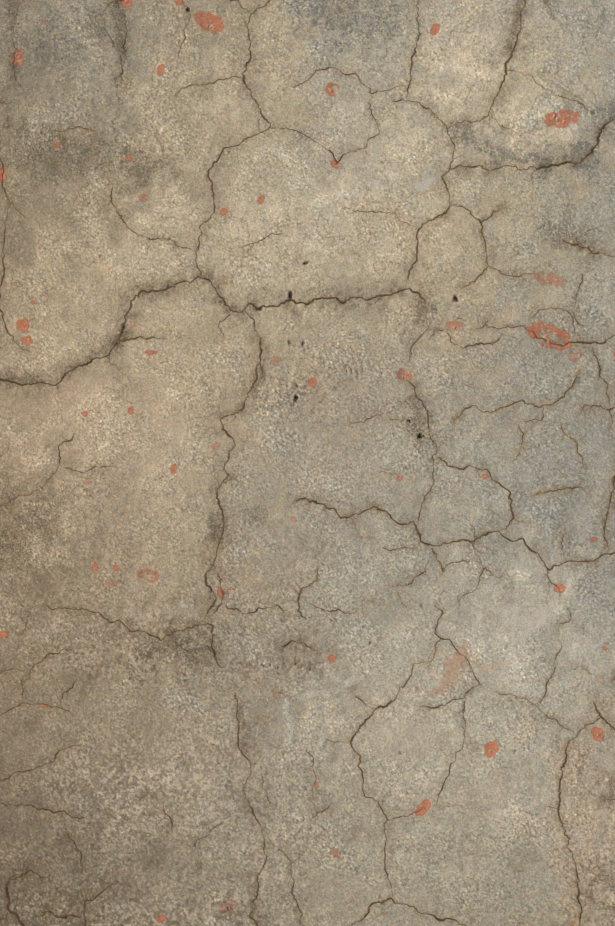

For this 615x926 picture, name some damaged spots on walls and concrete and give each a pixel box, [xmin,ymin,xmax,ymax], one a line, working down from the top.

crack [0,0,615,668]
crack [1,649,77,715]
crack [296,274,615,926]
crack [0,743,86,872]
crack [0,870,119,926]
crack [234,695,305,926]